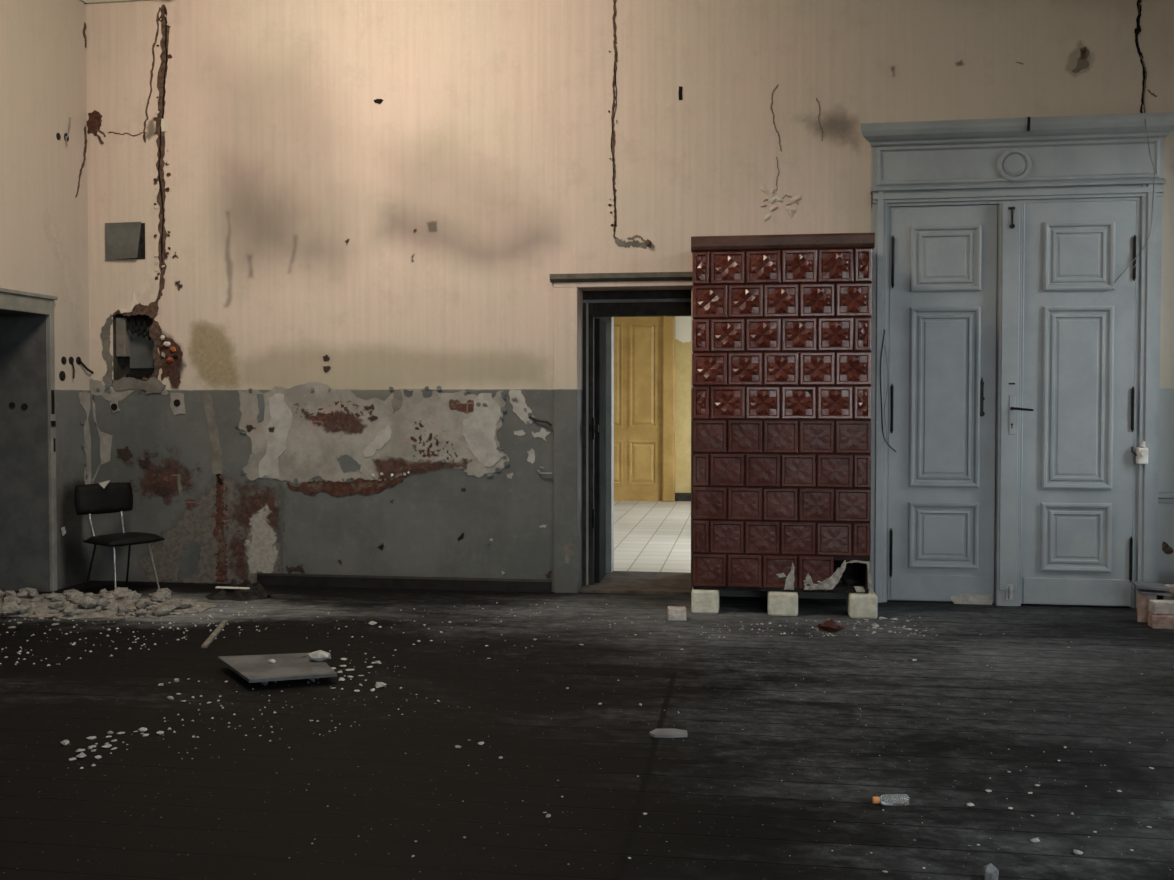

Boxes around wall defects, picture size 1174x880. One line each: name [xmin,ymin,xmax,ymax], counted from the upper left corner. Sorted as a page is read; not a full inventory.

crack [75,4,172,306]
crack [608,0,652,249]
crack [1134,0,1147,113]
peeling [79,293,551,584]
spalling [776,560,872,592]